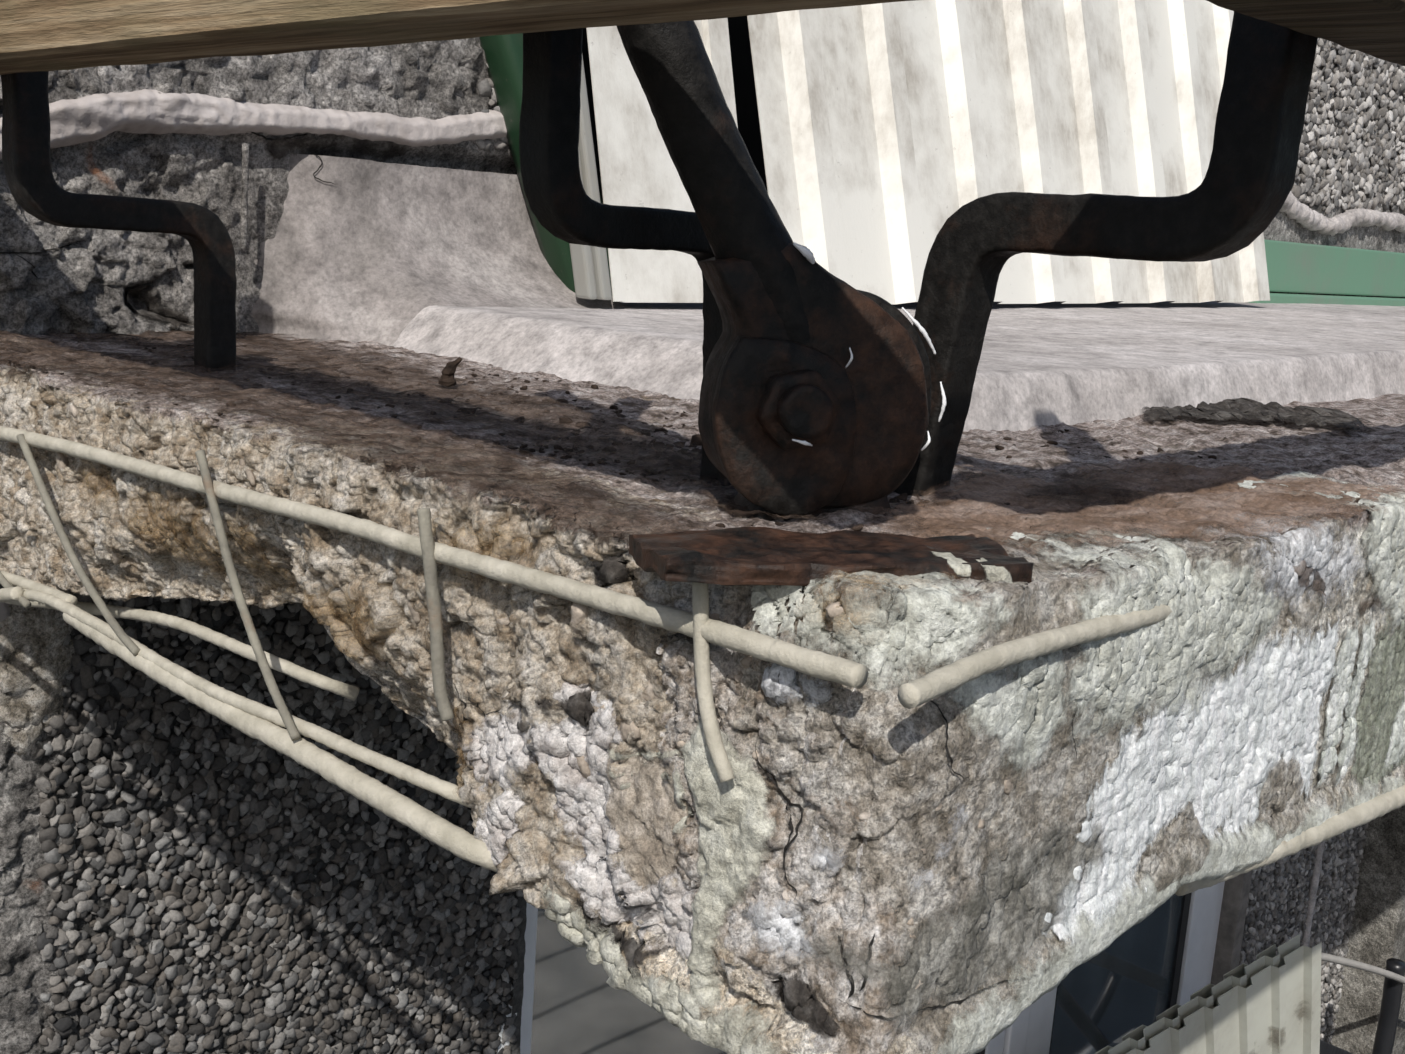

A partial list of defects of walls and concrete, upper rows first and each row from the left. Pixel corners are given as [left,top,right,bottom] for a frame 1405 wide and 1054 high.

crack [0,244,71,279]
rust [0,329,697,587]
rust [890,457,1399,548]
spalling [0,367,1371,1054]
crack [930,700,964,779]
damp [609,749,694,833]
crack [713,696,803,898]
crack [838,934,1050,1021]